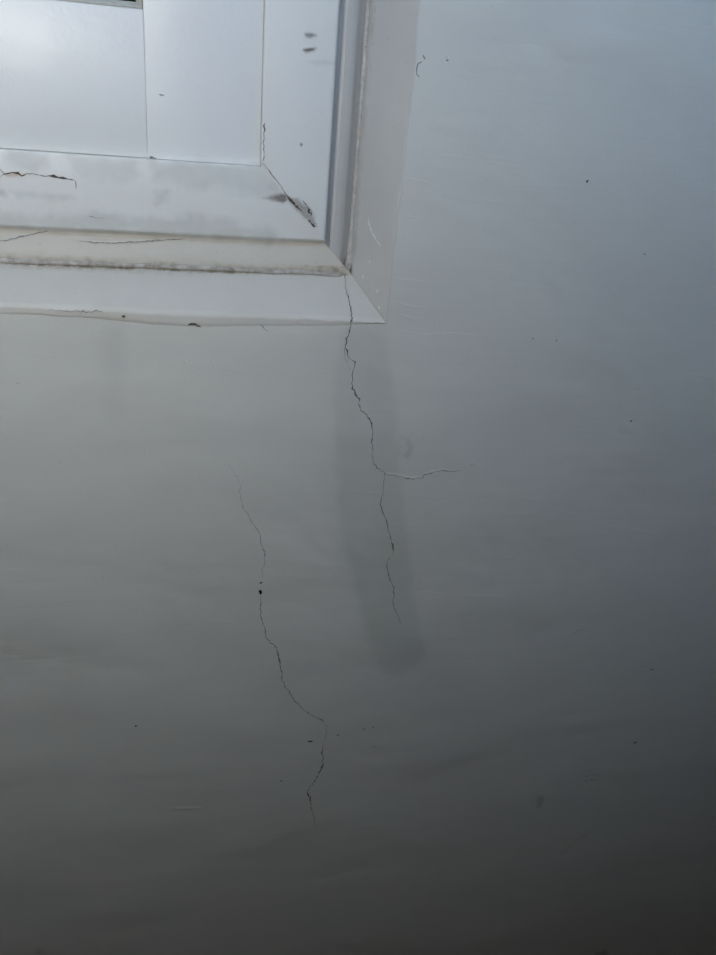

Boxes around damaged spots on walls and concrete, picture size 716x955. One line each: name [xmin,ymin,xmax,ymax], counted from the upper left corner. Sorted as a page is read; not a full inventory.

crack [344,274,473,621]
crack [229,465,327,821]